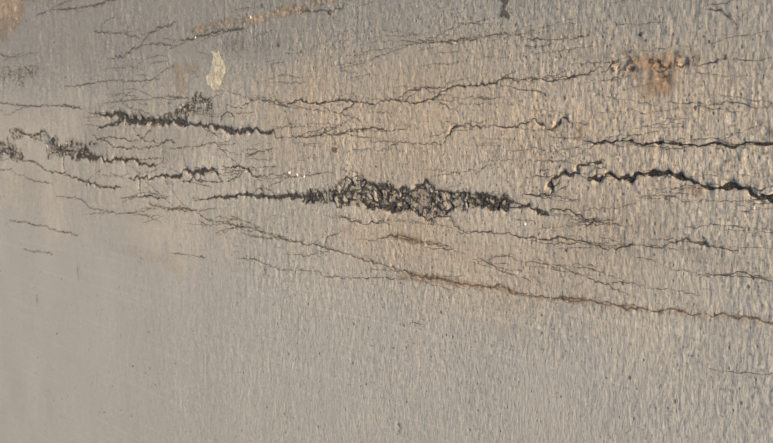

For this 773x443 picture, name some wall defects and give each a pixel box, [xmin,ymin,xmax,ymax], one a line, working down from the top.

crack [0,0,773,325]
spalling [299,175,549,224]